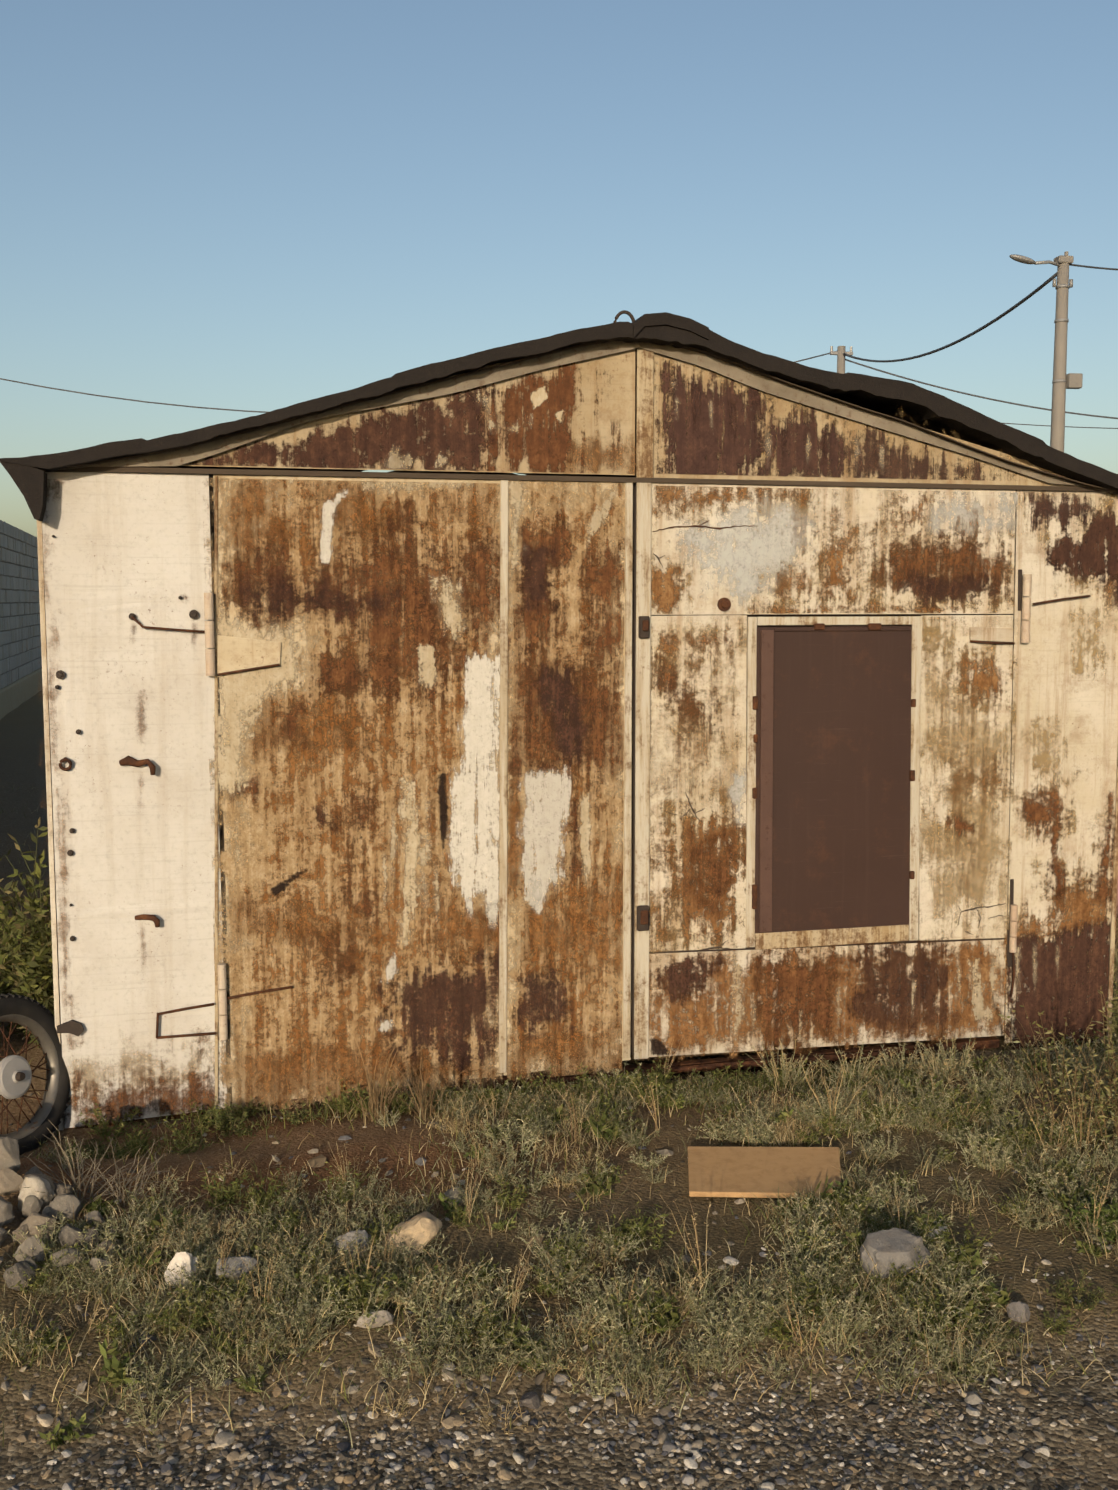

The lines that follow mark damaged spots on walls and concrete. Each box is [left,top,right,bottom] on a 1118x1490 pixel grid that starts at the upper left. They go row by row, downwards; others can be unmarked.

rust [64,362,636,1129]
rust [651,628,746,738]
rust [651,360,1016,713]
rust [649,782,1115,1060]
rust [937,767,1000,840]
rust [1019,492,1118,613]